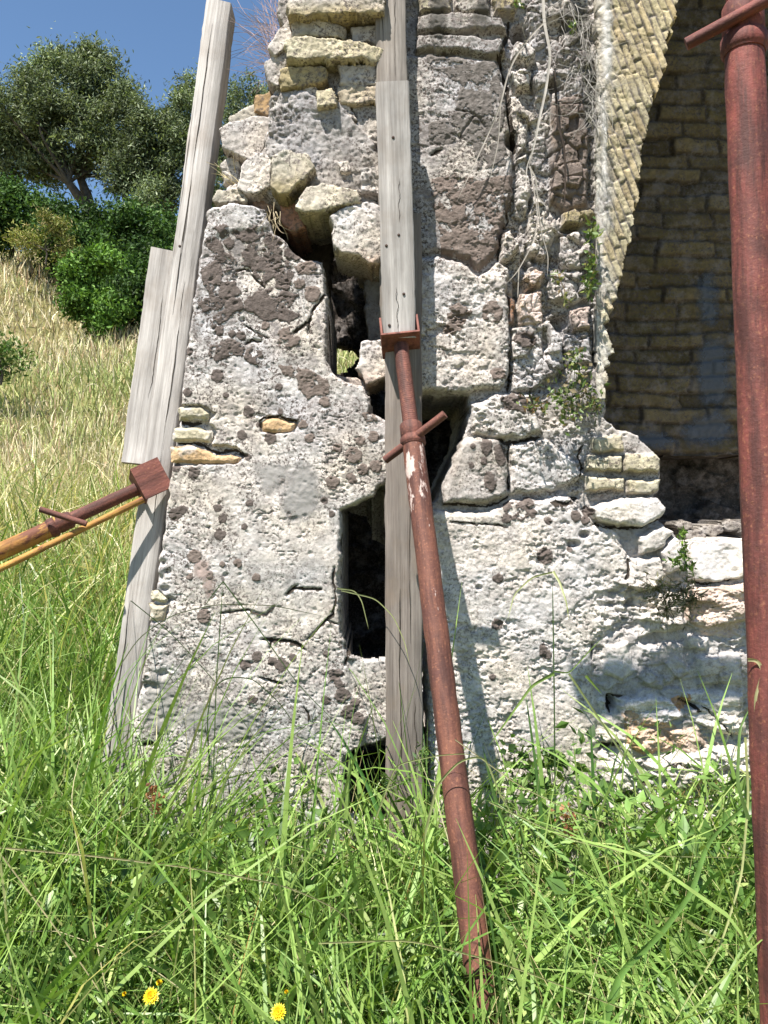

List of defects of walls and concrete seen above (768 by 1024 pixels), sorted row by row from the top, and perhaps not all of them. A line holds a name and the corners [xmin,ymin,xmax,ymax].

crack [497,22,517,154]
crack [293,294,326,334]
crack [221,568,337,649]